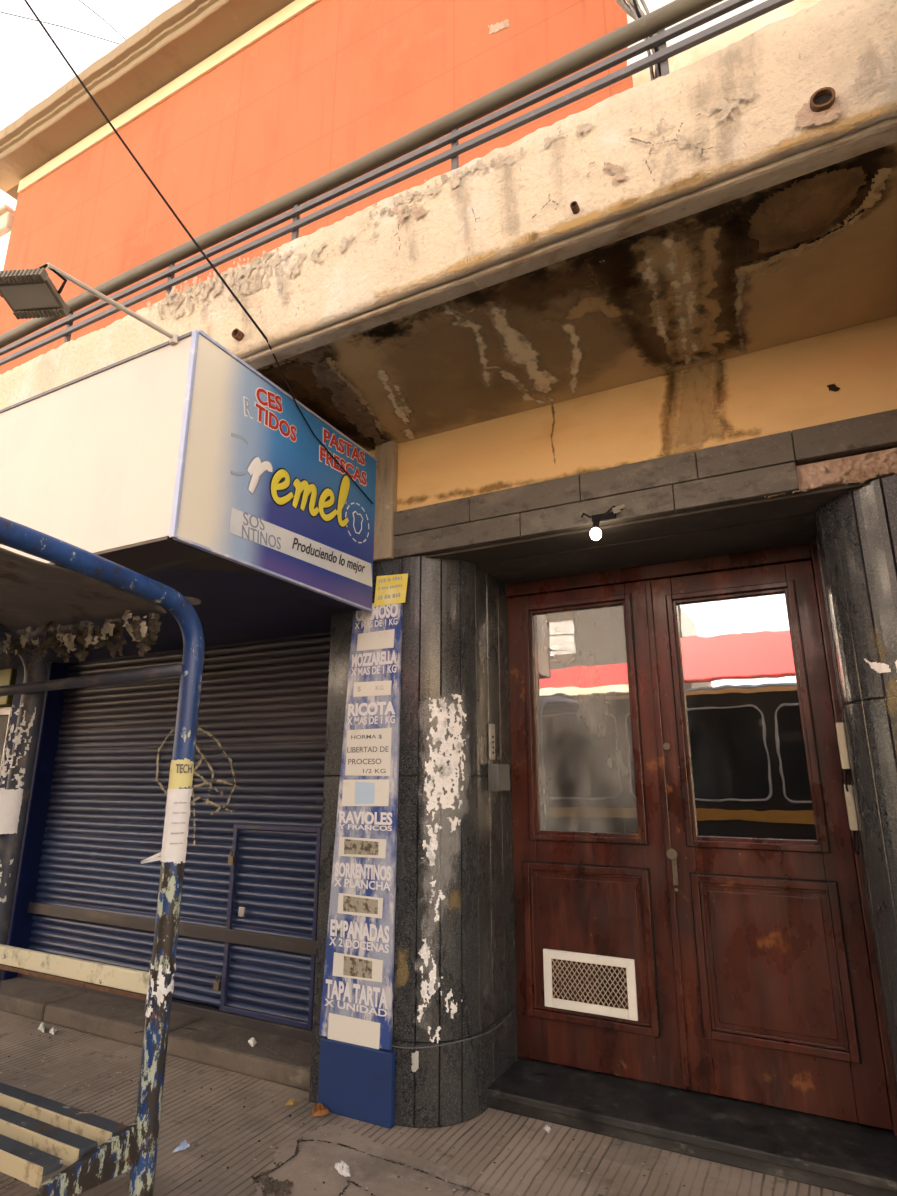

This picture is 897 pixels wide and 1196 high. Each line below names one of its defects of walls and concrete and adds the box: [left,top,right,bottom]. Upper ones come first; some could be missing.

damp [770,103,897,152]
damp [352,146,897,457]
damp [257,351,416,448]
crack [549,405,557,462]